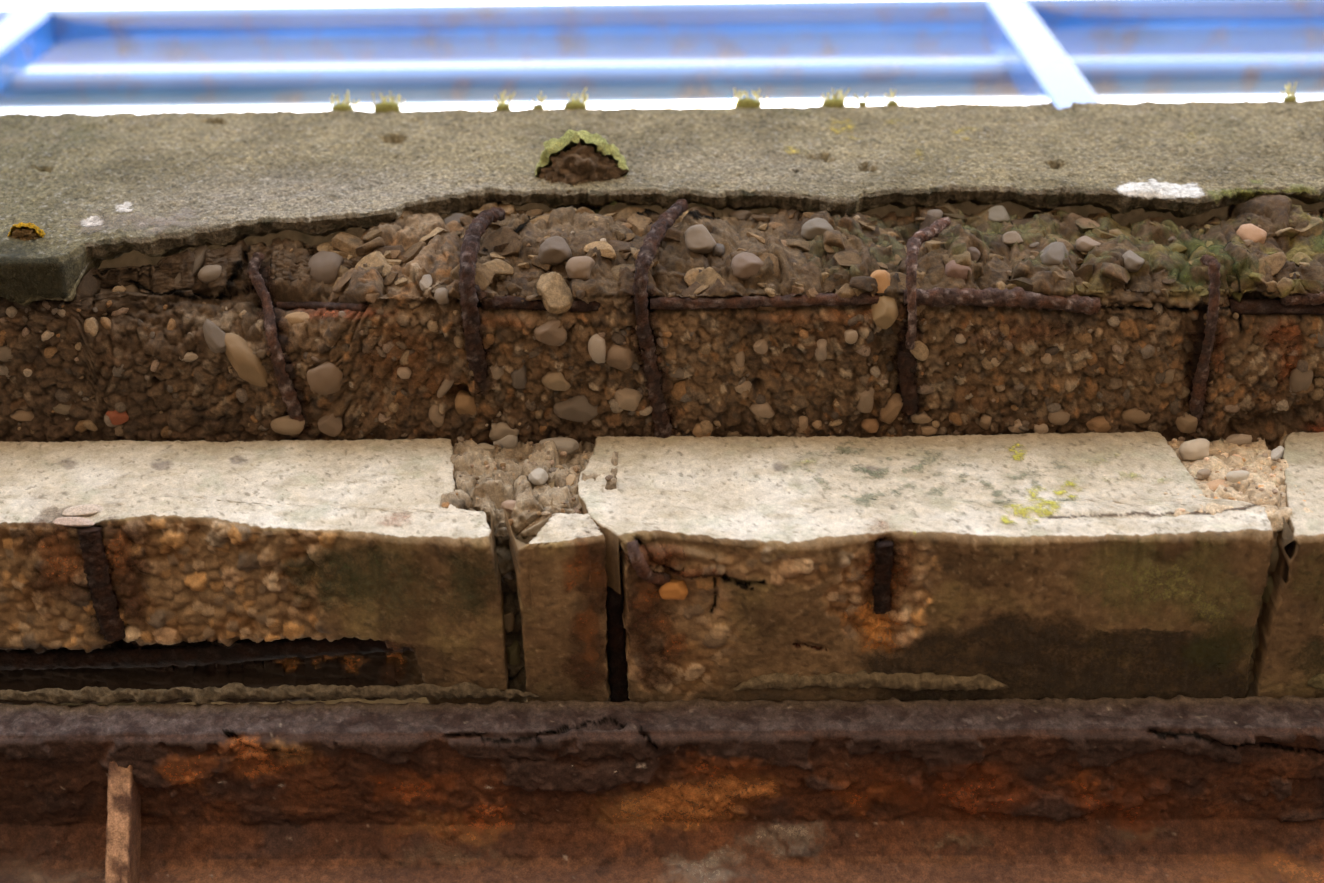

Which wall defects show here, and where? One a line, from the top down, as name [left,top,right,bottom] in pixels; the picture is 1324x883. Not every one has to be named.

corrosion [250,266,313,436]
corrosion [894,304,924,425]
corrosion [1183,297,1221,438]
spalling [0,194,1324,703]
corrosion [0,508,414,683]
crack [634,537,765,613]
corrosion [843,540,911,650]
damp [867,613,1253,701]
corrosion [159,737,321,785]
corrosion [372,775,514,842]
corrosion [613,758,778,830]
crack [1149,729,1324,754]